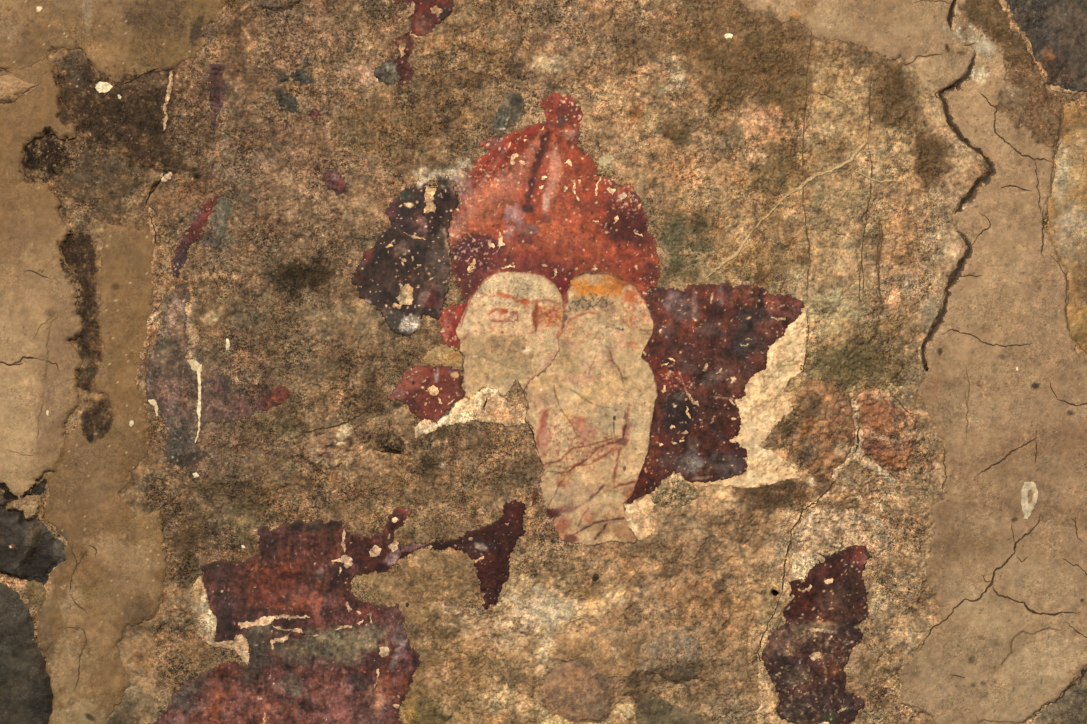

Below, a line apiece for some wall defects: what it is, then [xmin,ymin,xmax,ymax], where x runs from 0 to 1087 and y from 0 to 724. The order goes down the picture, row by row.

crack [907,0,1087,371]
flaking render [998,0,1087,353]
crack [0,313,75,378]
flaking render [414,387,527,438]
flaking render [624,308,918,540]
crack [921,368,970,495]
crack [979,437,1037,474]
flaking render [0,479,66,724]
flaking render [190,576,235,650]
flaking render [790,507,896,580]
crack [917,514,1087,652]
crack [1045,668,1087,724]